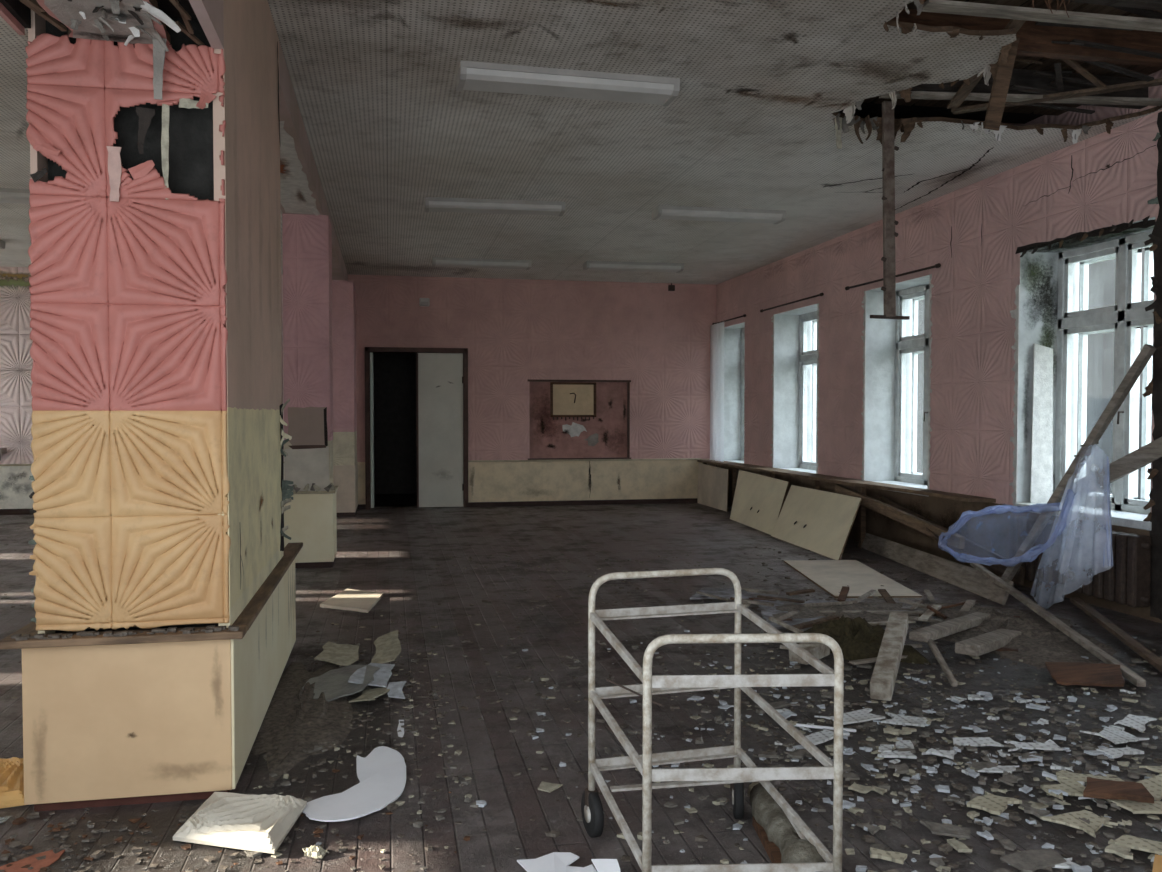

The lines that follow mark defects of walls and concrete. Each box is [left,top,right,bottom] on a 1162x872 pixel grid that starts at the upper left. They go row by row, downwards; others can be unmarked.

peeling [44,0,181,52]
peeling [939,42,1013,89]
peeling [832,100,864,133]
peeling [889,87,913,110]
crack [1031,145,1156,202]